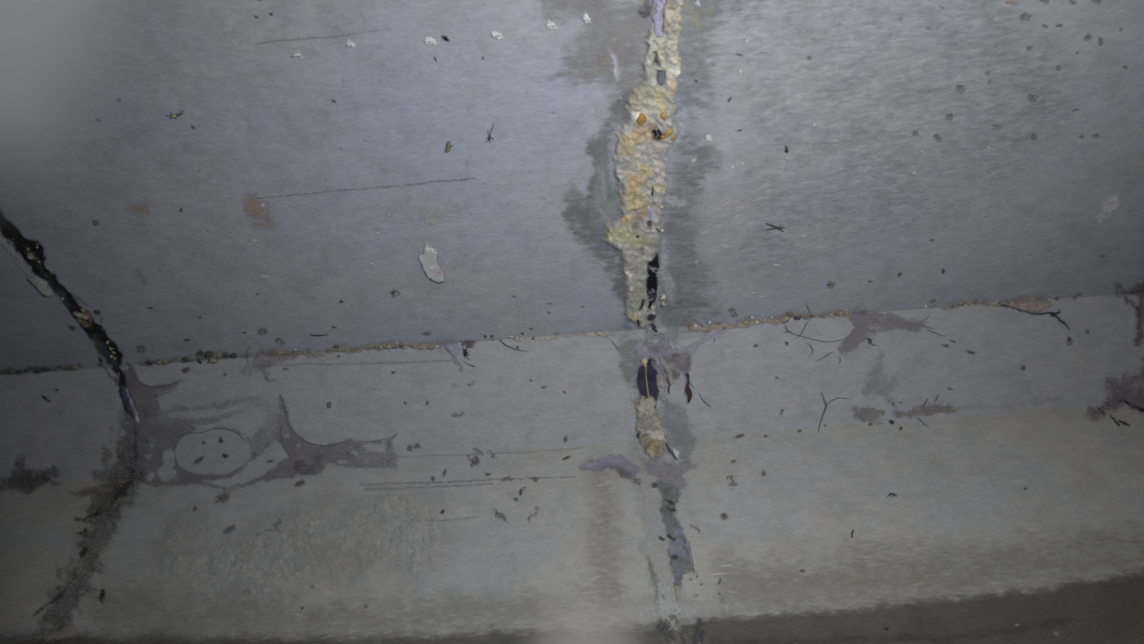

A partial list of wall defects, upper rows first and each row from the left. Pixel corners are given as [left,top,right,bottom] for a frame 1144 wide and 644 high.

water stain [544,0,756,388]
crack [637,253,673,401]
crack [994,304,1069,328]
crack [0,210,150,644]
crack [648,481,704,644]